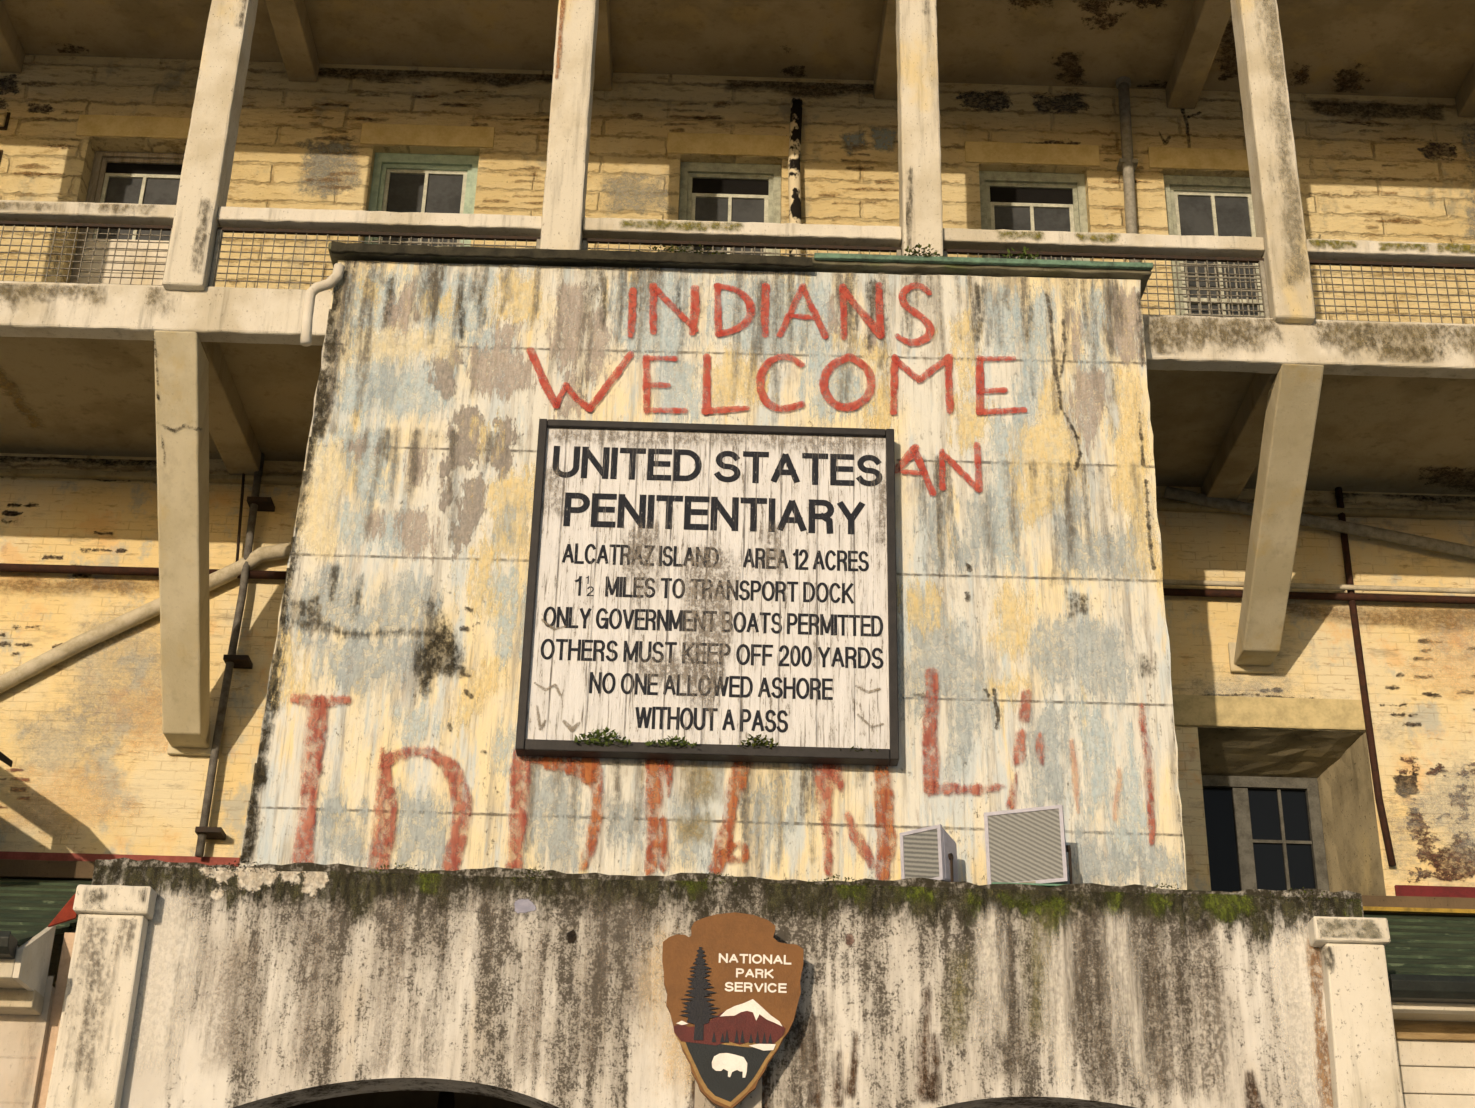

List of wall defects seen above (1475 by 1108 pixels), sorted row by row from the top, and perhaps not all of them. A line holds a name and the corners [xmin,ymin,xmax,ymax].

water stain [0,283,102,303]
crack [1045,294,1082,470]
water stain [1316,321,1475,362]
water stain [555,428,883,453]
peeling [1,503,39,524]
peeling [42,531,127,578]
peeling [0,625,39,655]
water stain [78,261,713,1086]
water stain [631,539,737,713]
peeling [1380,638,1475,727]
spalling [1393,757,1475,883]
water stain [762,821,1380,1090]